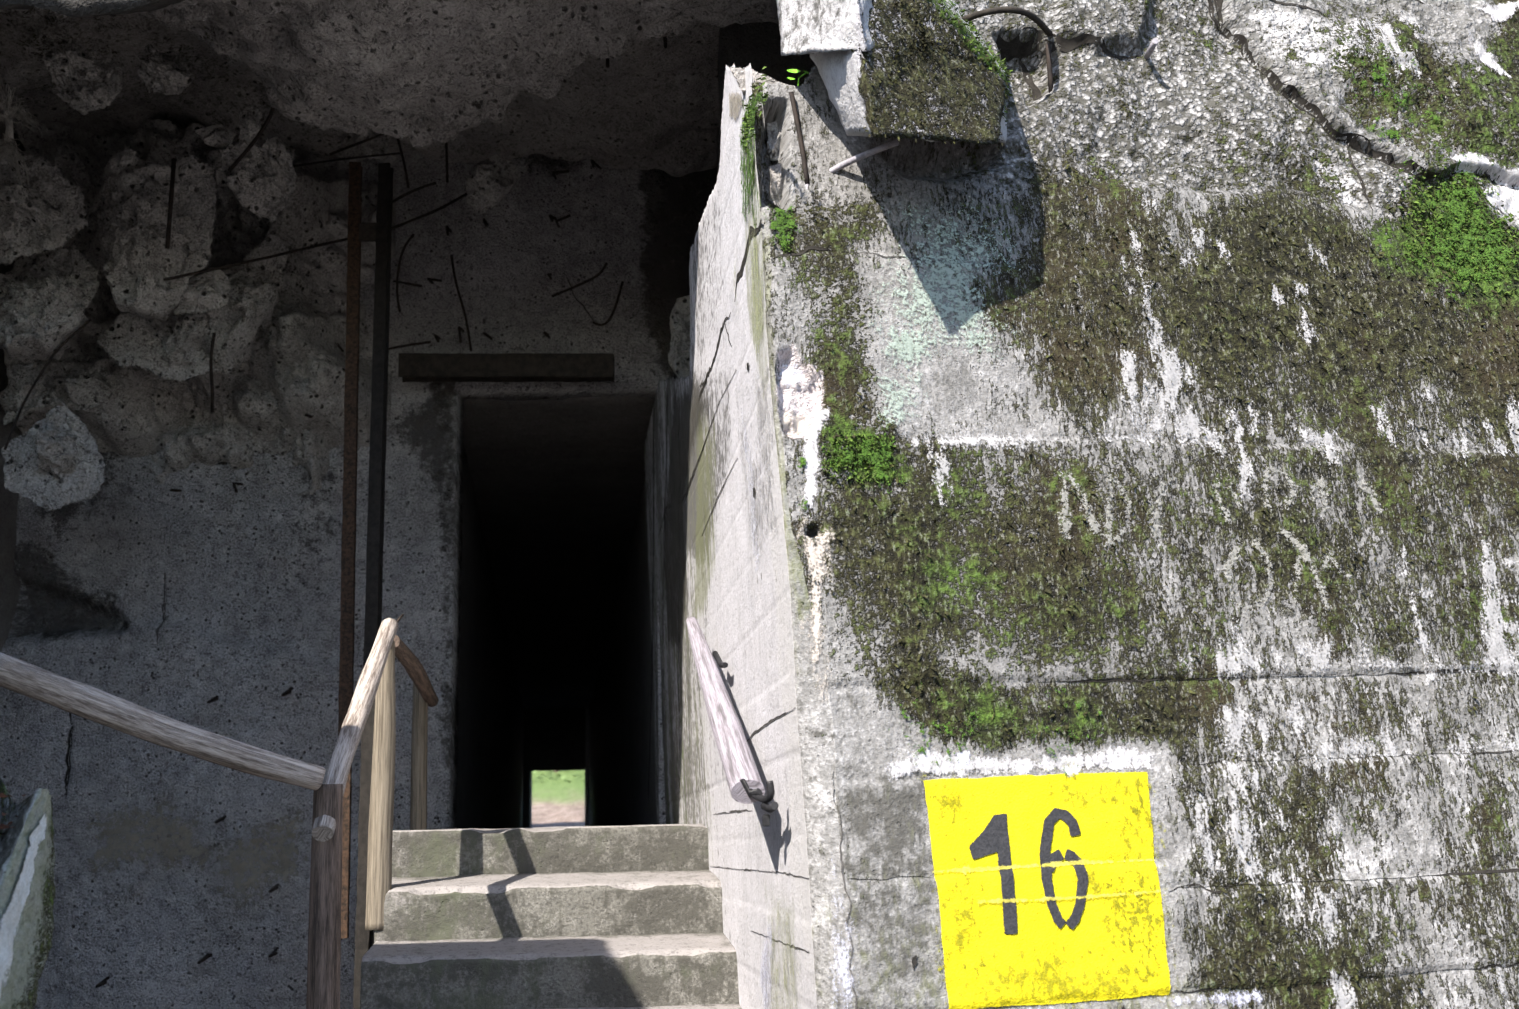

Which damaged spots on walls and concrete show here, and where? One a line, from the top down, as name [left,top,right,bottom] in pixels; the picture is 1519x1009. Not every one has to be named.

spalling [228,107,275,172]
crack [996,27,1142,100]
crack [1208,0,1518,210]
spalling [165,158,176,249]
spalling [163,238,347,281]
spalling [4,319,92,450]
damp [1078,195,1272,500]
damp [1369,386,1519,469]
damp [1178,618,1336,680]
damp [1351,540,1519,688]
damp [885,746,1154,780]
damp [1186,699,1401,884]